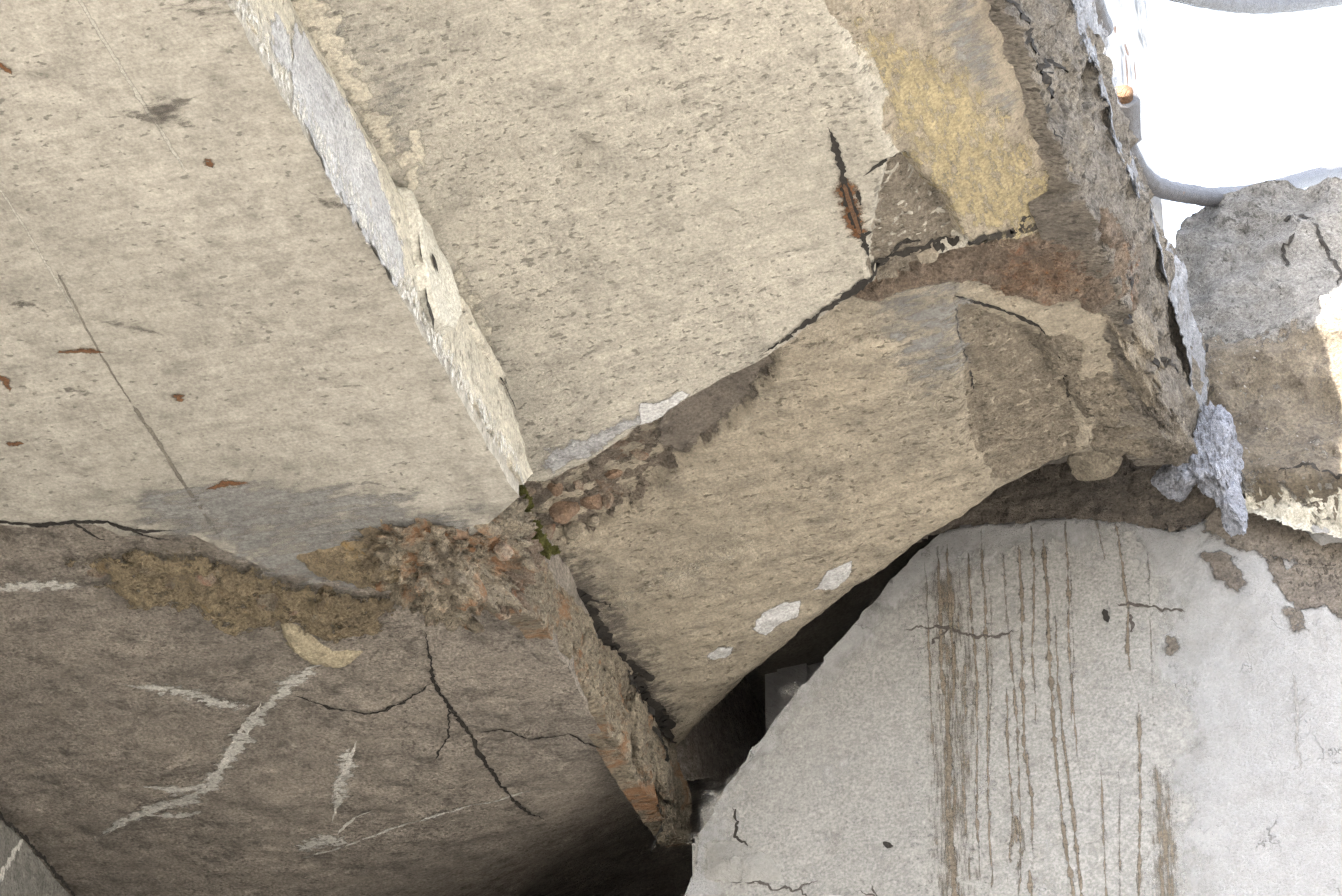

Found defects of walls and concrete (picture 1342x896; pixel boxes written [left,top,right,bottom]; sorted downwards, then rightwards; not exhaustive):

crack [1006,0,1069,146]
rust [834,179,868,239]
crack [759,215,1038,357]
spalling [853,151,1131,314]
spalling [916,0,1342,632]
crack [1281,214,1342,284]
spalling [518,356,774,541]
spalling [65,539,396,644]
crack [1116,601,1183,632]
crack [94,633,600,859]
crack [733,809,748,846]
crack [731,880,818,896]